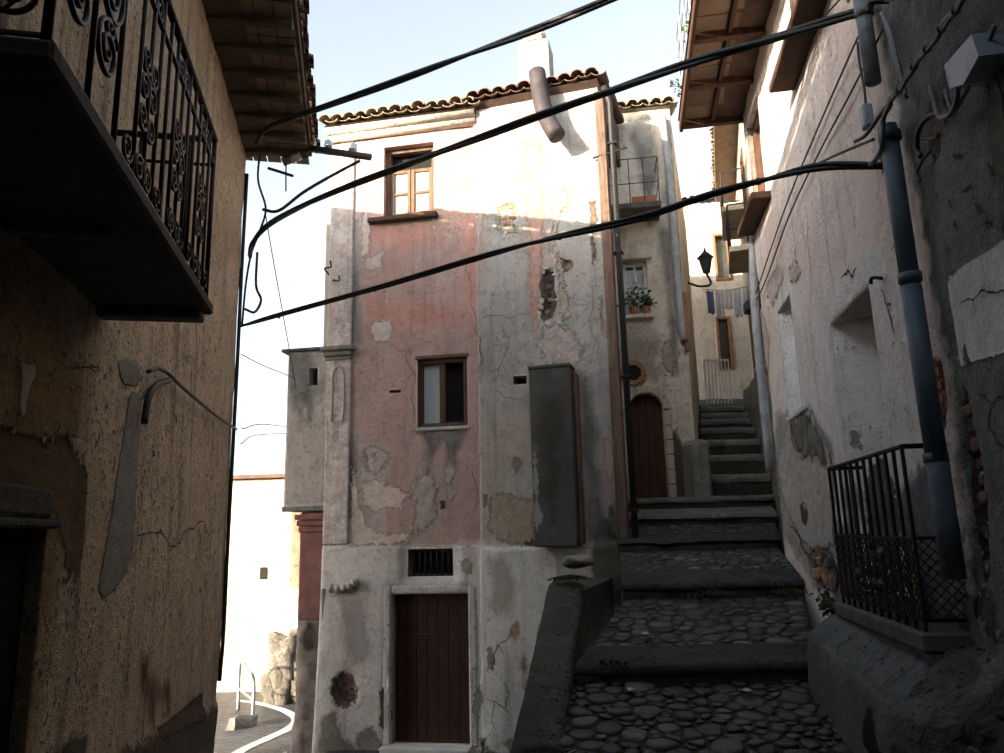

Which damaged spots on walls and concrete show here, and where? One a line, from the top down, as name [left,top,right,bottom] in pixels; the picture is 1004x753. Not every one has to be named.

peeling [475,114,498,253]
peeling [496,105,586,366]
crack [959,282,1004,311]
peeling [0,361,89,577]
crack [137,521,220,547]
peeling [348,465,410,547]
peeling [482,451,544,546]
peeling [779,409,837,592]
spalling [933,357,990,588]
spalling [329,671,359,710]
crack [486,630,512,729]
spalling [862,708,881,753]